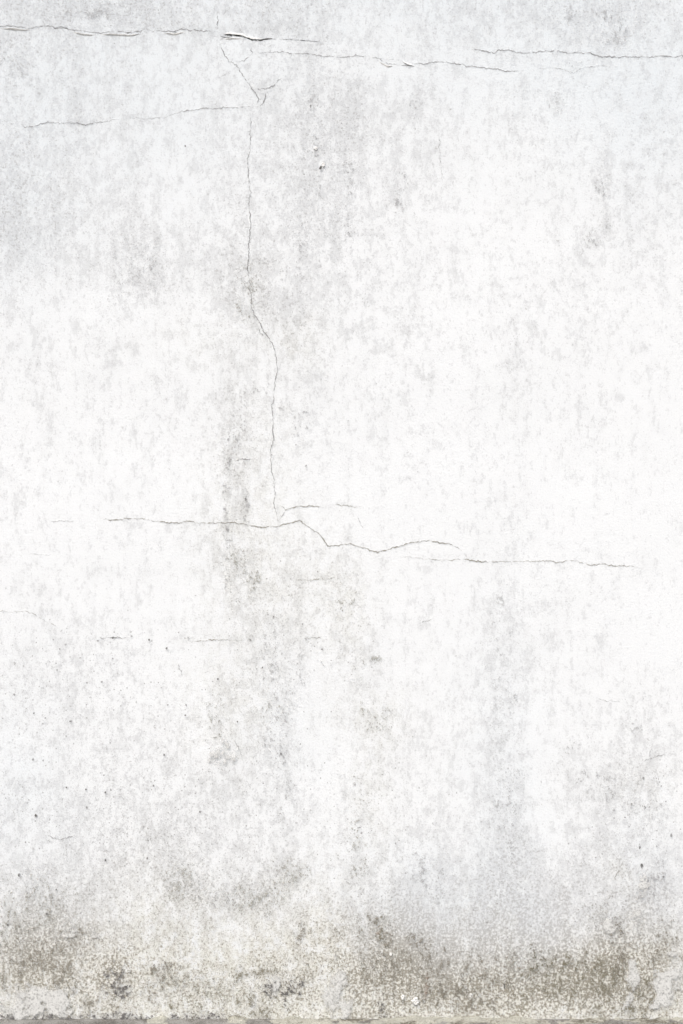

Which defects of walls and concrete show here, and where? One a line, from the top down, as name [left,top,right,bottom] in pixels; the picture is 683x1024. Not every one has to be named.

crack [0,16,683,567]
mould [232,966,305,1011]